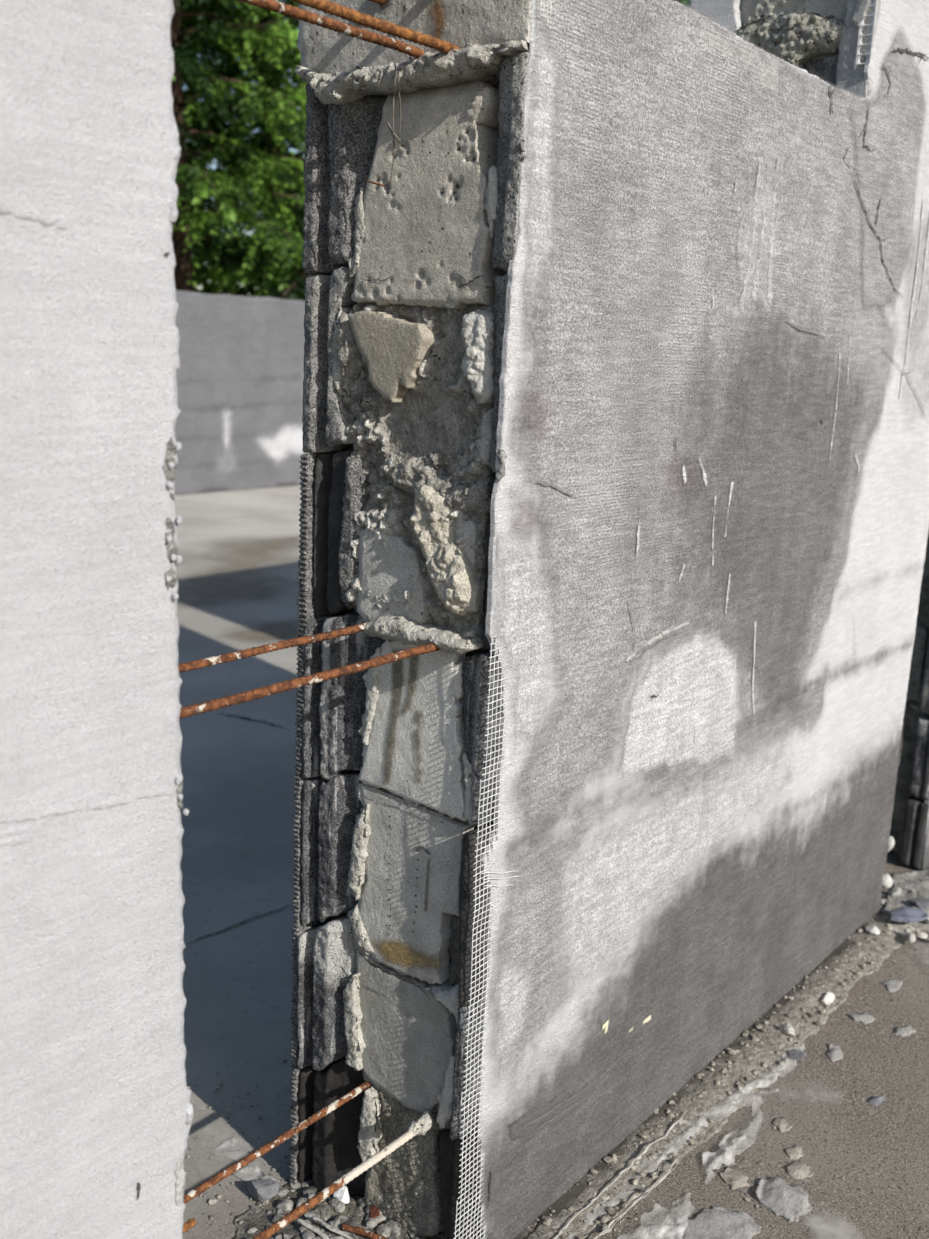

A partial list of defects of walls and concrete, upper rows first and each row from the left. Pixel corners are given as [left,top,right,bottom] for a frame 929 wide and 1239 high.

crack [845,48,929,297]
peeling [348,311,434,403]
spalling [496,449,507,480]
water stain [483,0,929,1239]
spalling [179,643,441,719]